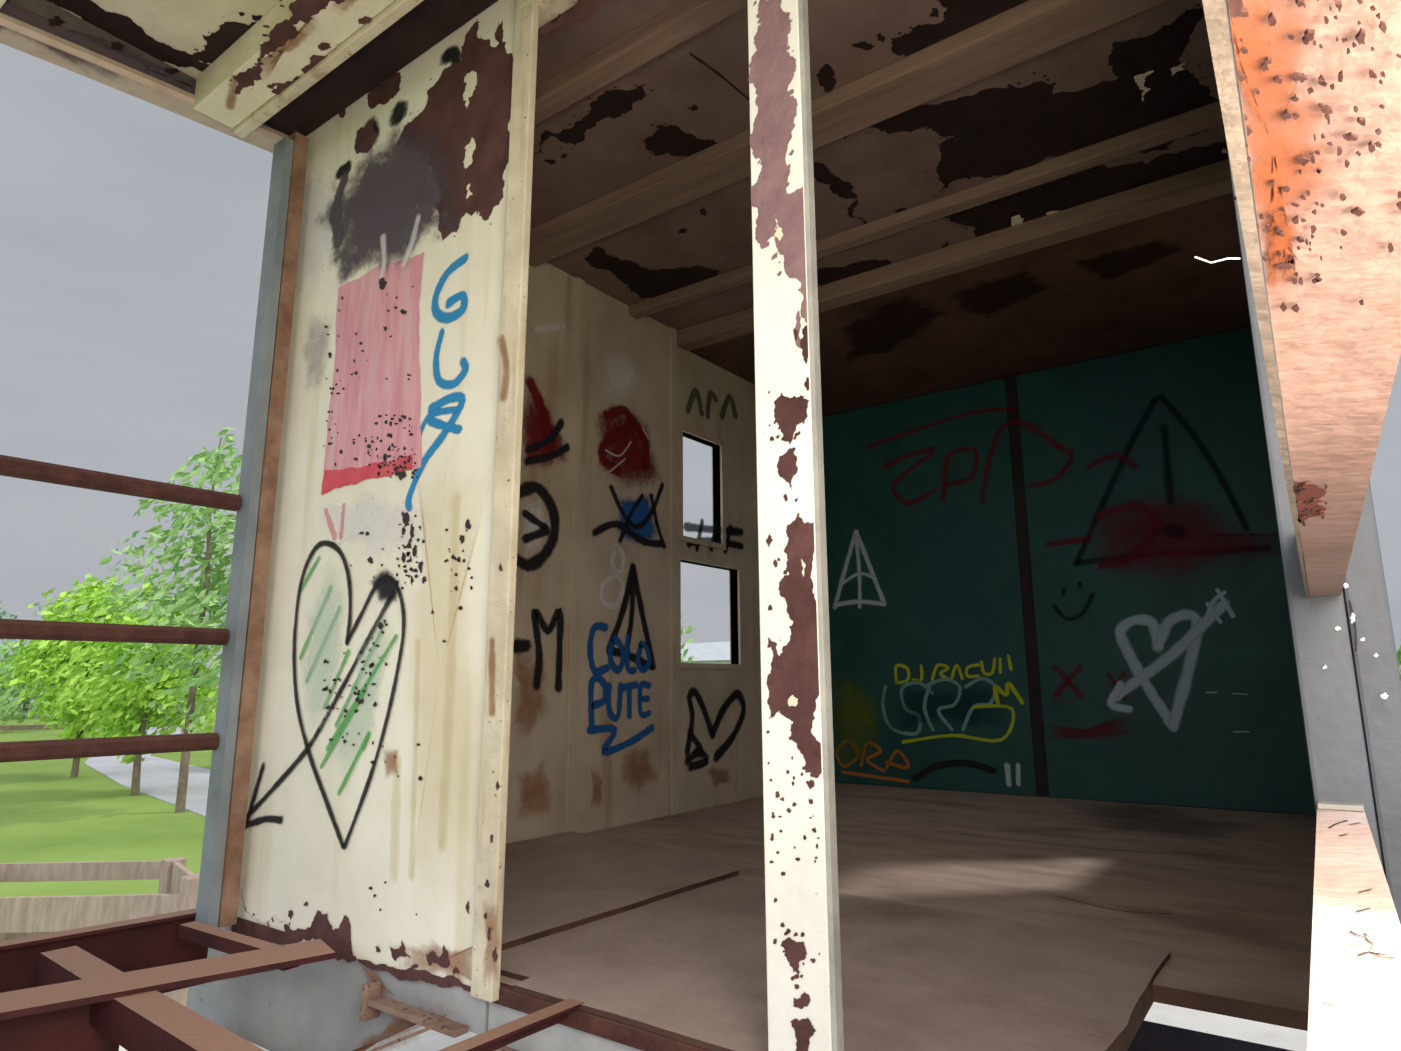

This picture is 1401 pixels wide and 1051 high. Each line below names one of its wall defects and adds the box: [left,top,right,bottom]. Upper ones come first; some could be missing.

peeling [47,0,345,95]
peeling [354,72,401,154]
peeling [397,19,513,241]
peeling [851,0,1220,196]
peeling [942,128,1228,248]
corrosion [1230,0,1314,279]
peeling [1236,0,1387,285]
peeling [350,511,426,589]
peeling [689,0,892,876]
corrosion [1294,482,1327,518]
peeling [231,889,471,992]
peeling [773,922,820,1051]